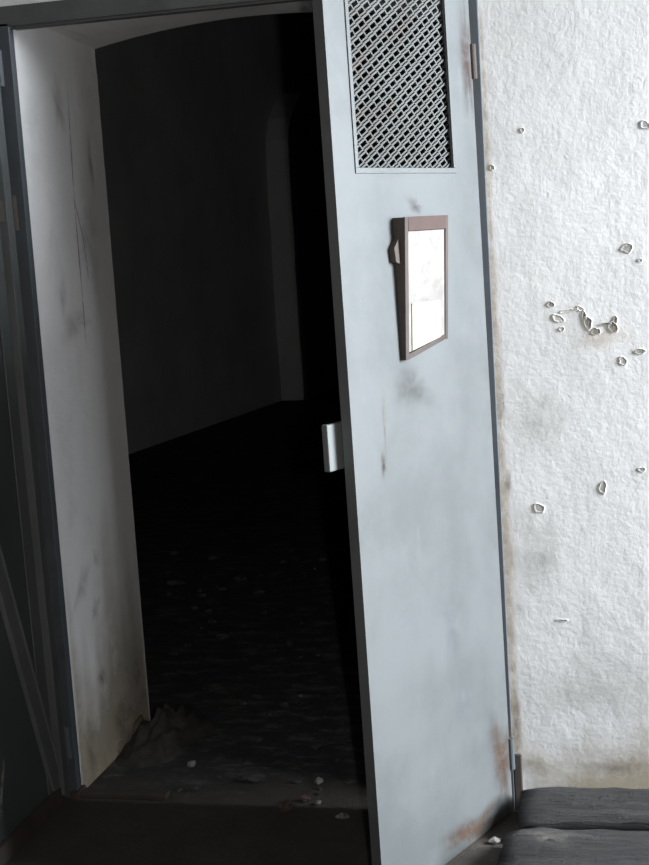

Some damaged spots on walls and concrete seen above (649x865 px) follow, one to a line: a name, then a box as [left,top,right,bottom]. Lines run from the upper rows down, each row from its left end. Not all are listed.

flaking render [547,301,619,335]
leakage [80,658,149,788]
leakage [569,764,649,789]